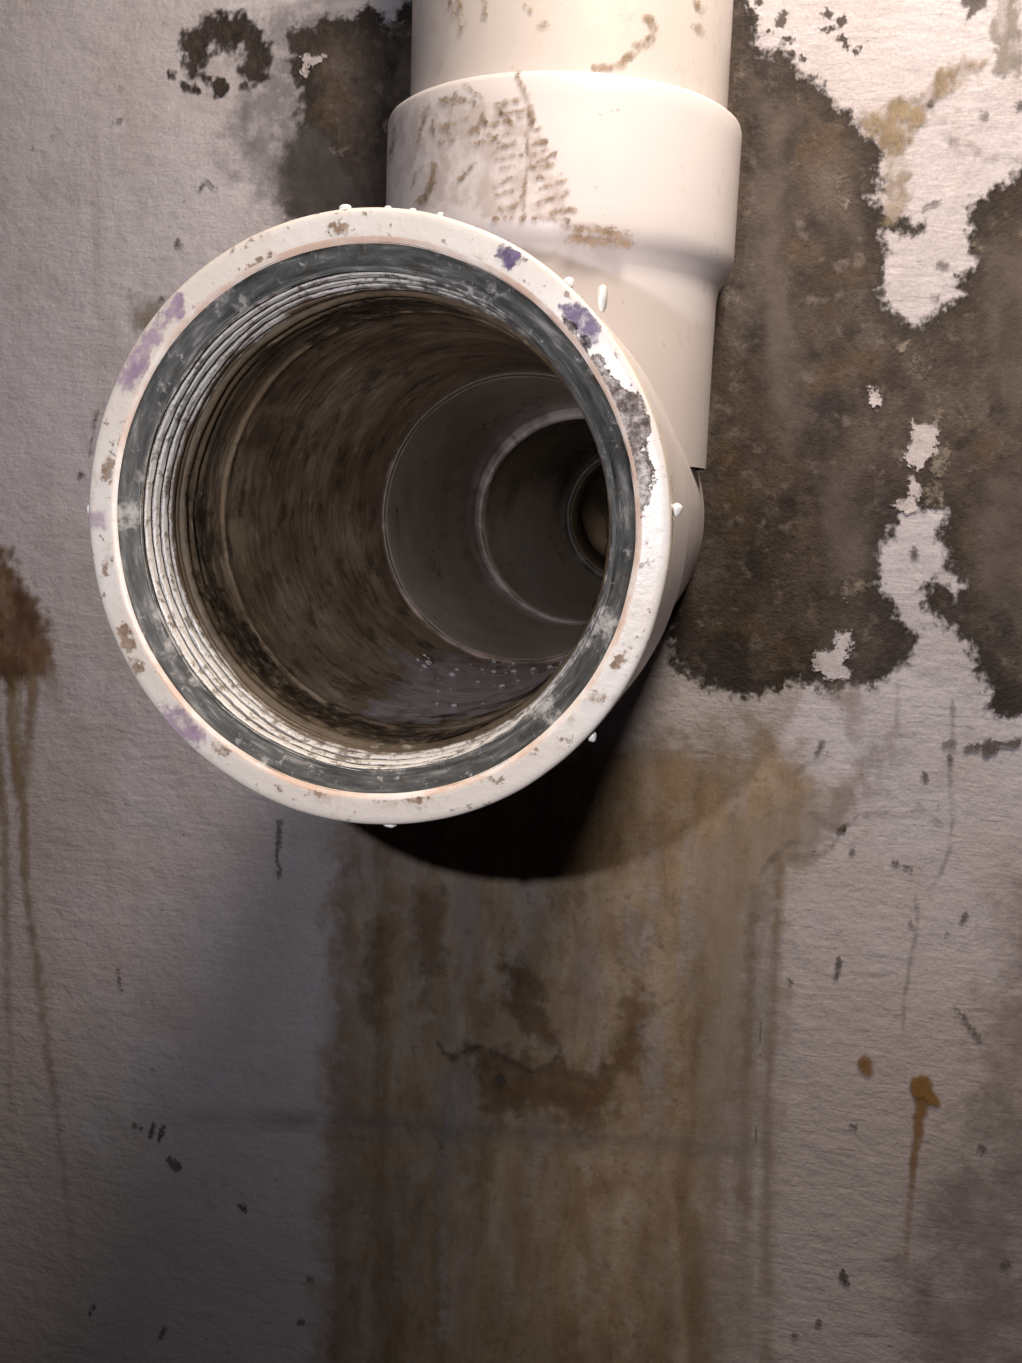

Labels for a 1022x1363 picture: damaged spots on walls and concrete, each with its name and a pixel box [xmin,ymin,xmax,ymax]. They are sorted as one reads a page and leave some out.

flaking render [665,0,1022,718]
corrosion [0,548,51,901]
peeling [942,737,1022,762]
water stain [325,730,814,1363]
corrosion [910,1076,940,1171]